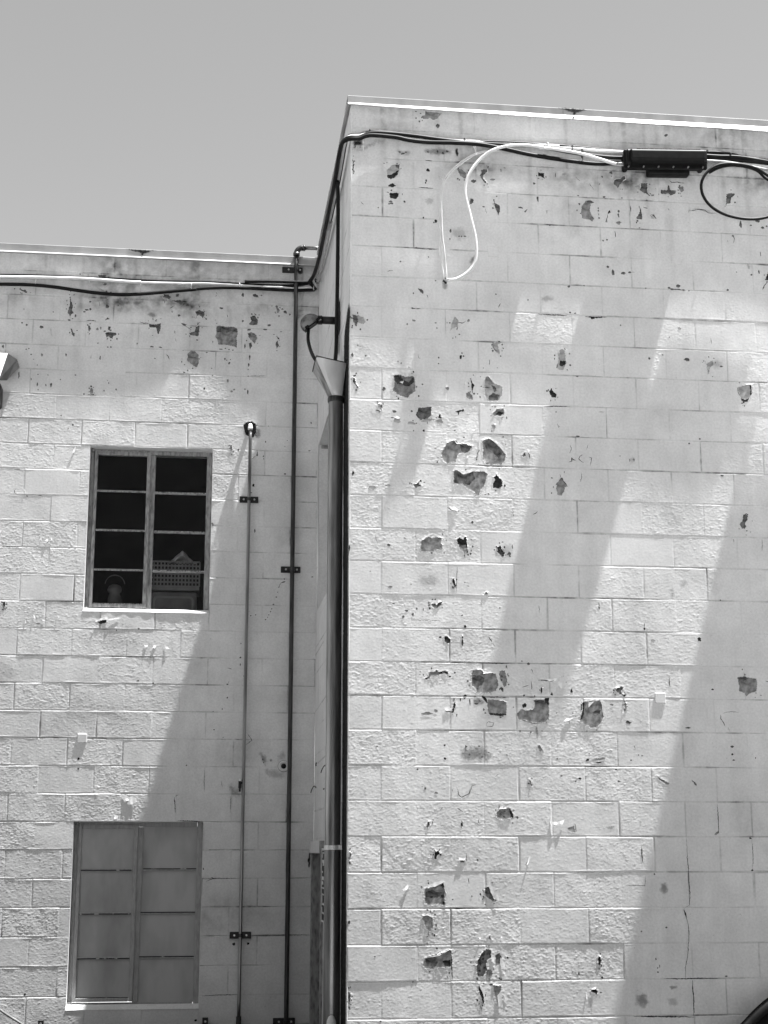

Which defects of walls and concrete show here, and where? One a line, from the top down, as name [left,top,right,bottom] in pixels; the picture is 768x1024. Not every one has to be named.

peeling [163,293,291,371]
peeling [373,361,443,432]
peeling [434,341,507,498]
peeling [404,534,473,557]
peeling [419,665,573,733]
peeling [572,687,632,732]
peeling [737,669,768,698]
peeling [421,880,509,1009]